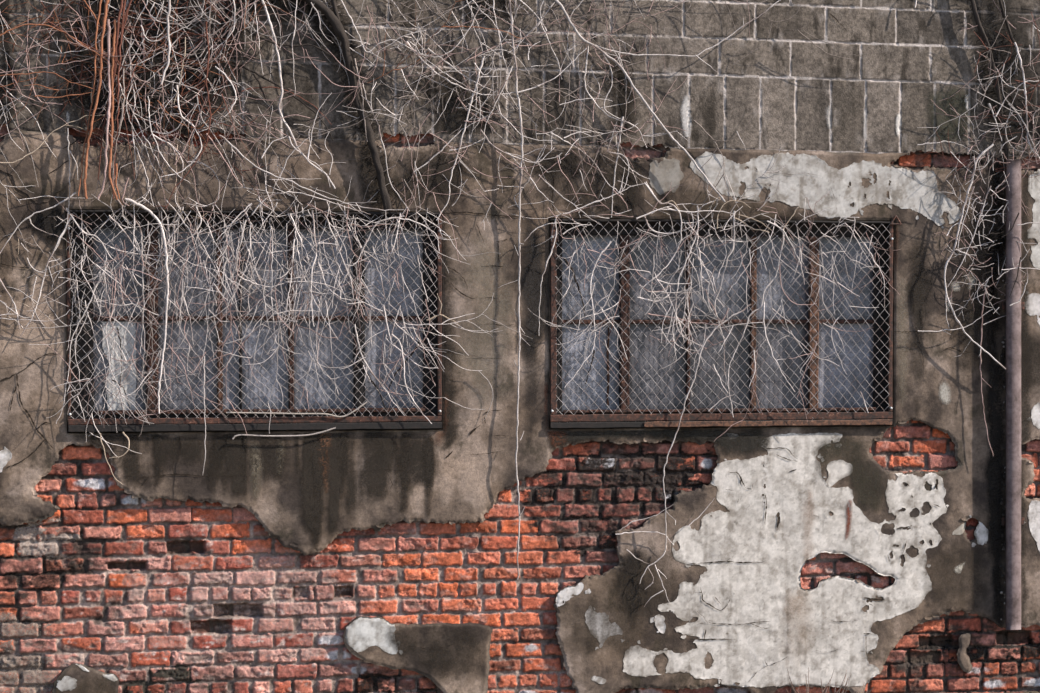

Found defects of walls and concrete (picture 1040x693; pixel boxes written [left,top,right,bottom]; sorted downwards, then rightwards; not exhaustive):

peeling [621,142,981,228]
water stain [523,221,546,368]
crack [0,353,58,468]
water stain [90,244,457,546]
spalling [0,402,1040,693]